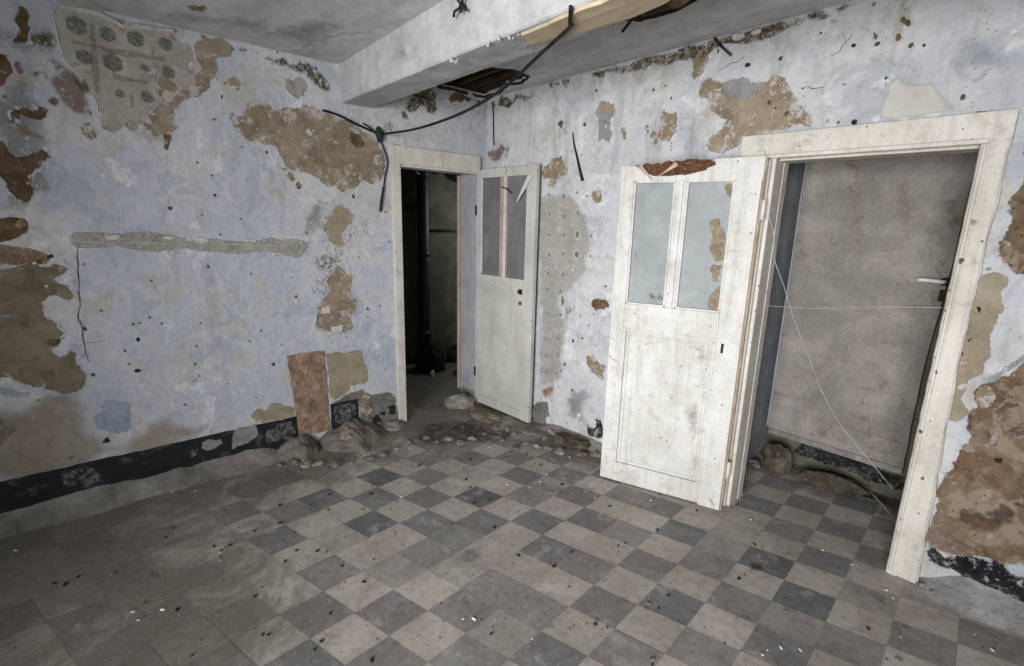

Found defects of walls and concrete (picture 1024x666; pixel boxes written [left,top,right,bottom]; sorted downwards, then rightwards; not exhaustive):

peeling [78,122,102,141]
peeling [139,43,241,150]
peeling [221,75,386,247]
peeling [643,110,681,151]
peeling [689,49,828,157]
peeling [0,104,95,401]
crack [76,248,101,362]
peeling [313,265,369,335]
peeling [990,175,1024,280]
flaking render [926,355,1024,569]